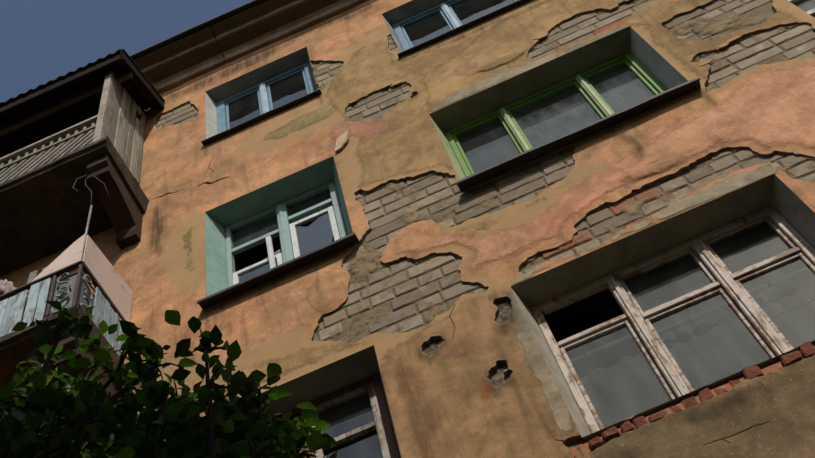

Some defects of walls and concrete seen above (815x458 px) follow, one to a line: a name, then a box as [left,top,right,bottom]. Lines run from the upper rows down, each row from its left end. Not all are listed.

flaking render [155,101,199,129]
crack [152,159,228,200]
peeling [166,0,815,458]